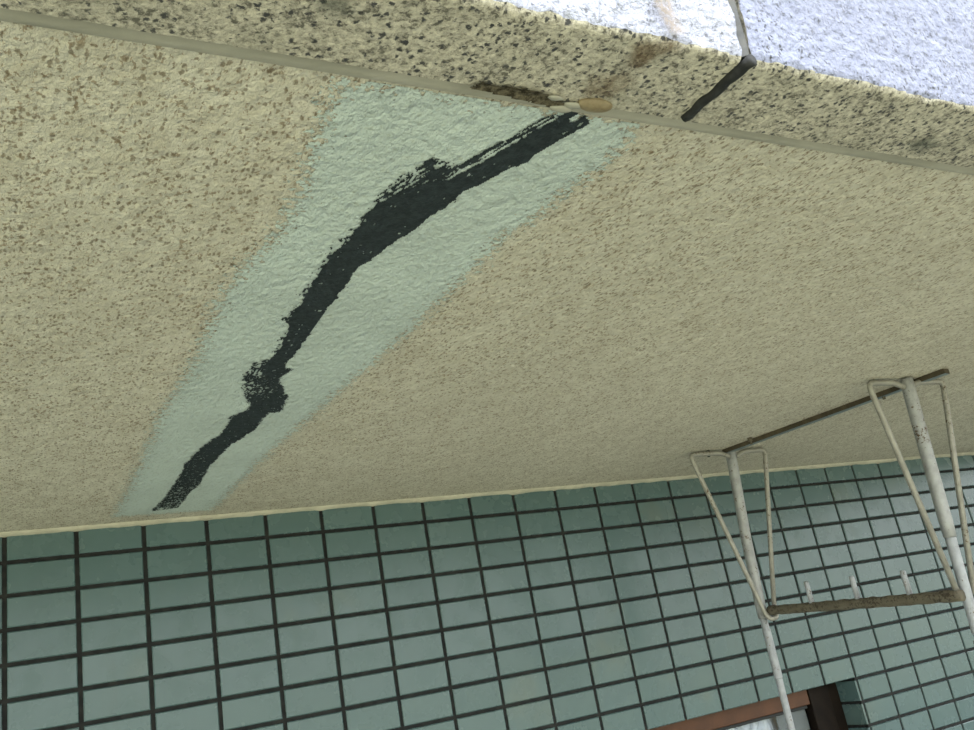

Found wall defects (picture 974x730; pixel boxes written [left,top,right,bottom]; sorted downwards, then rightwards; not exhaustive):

crack [153,112,590,511]